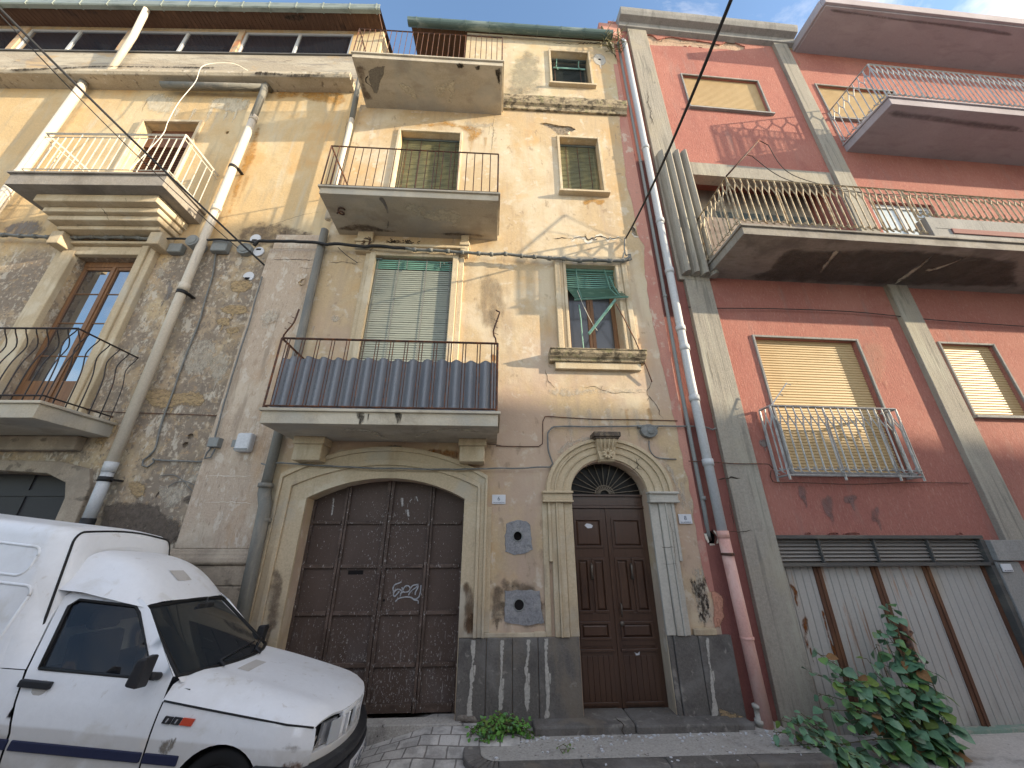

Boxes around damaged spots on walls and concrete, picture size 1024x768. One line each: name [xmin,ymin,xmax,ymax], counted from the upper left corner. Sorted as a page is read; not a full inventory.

spalling [365,66,385,93]
spalling [541,123,575,135]
crack [554,234,622,244]
water stain [492,582,534,627]